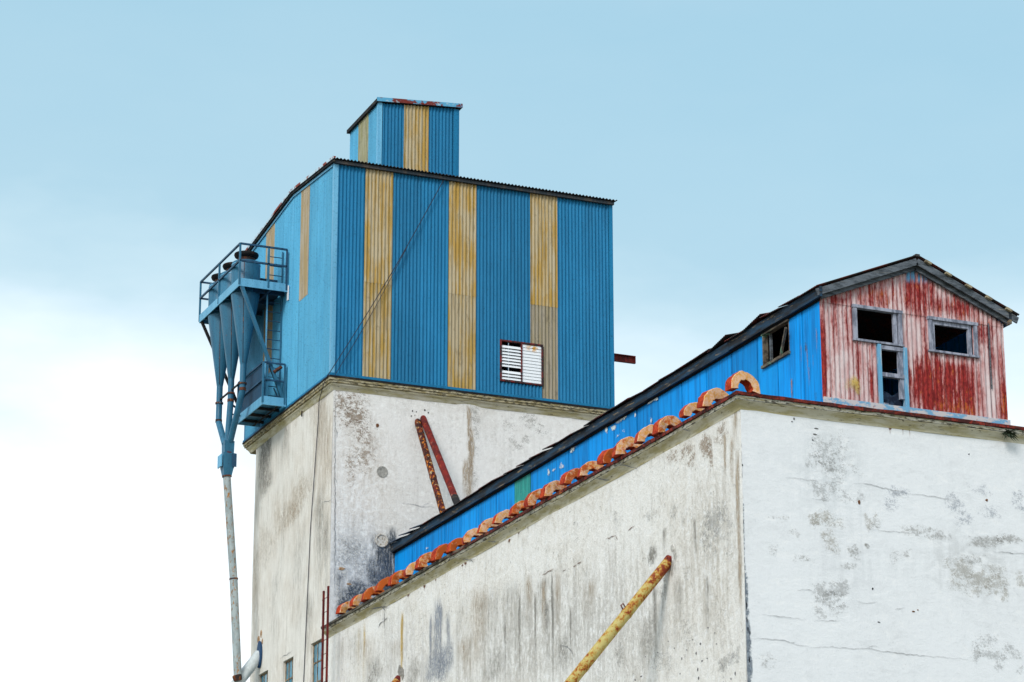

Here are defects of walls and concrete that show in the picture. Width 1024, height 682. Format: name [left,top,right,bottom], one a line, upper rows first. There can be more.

peeling [334,390,379,481]
leakage [337,530,396,617]
leakage [428,604,464,678]
leakage [504,578,554,651]
crack [753,614,966,660]